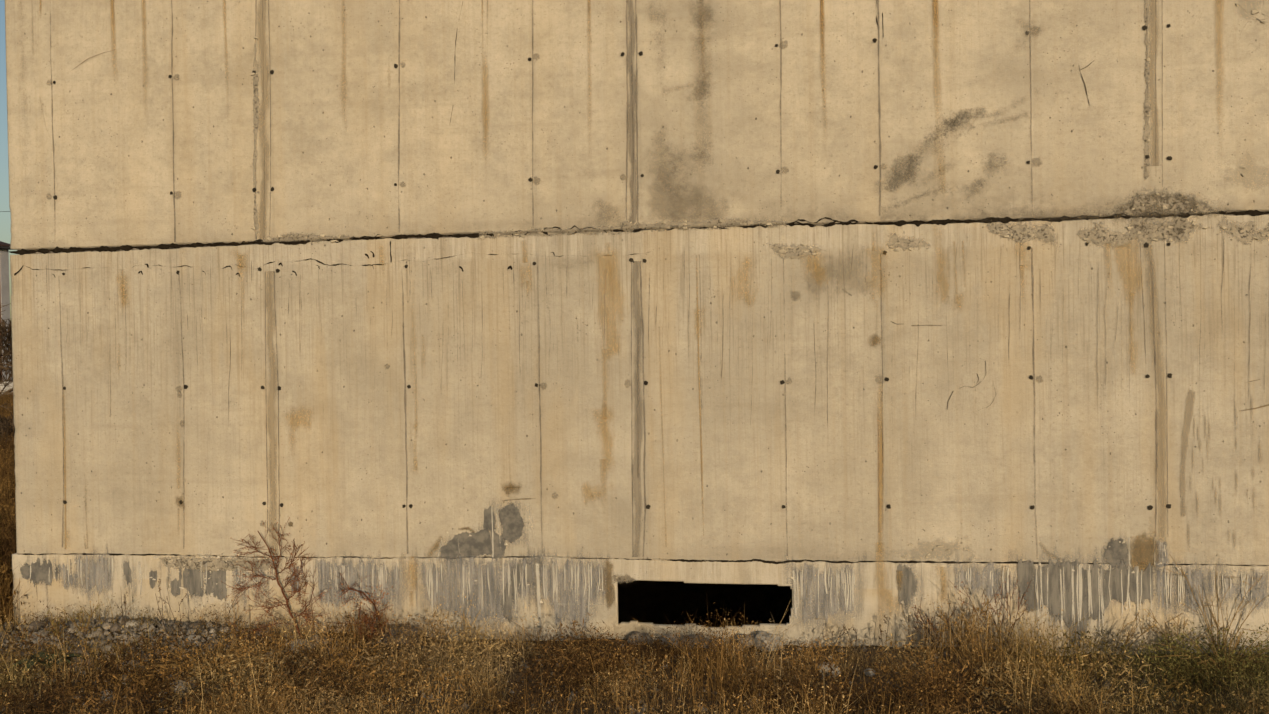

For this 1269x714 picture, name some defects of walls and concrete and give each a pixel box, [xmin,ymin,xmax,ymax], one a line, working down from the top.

spalling [984,221,1055,243]
spalling [1078,0,1269,247]